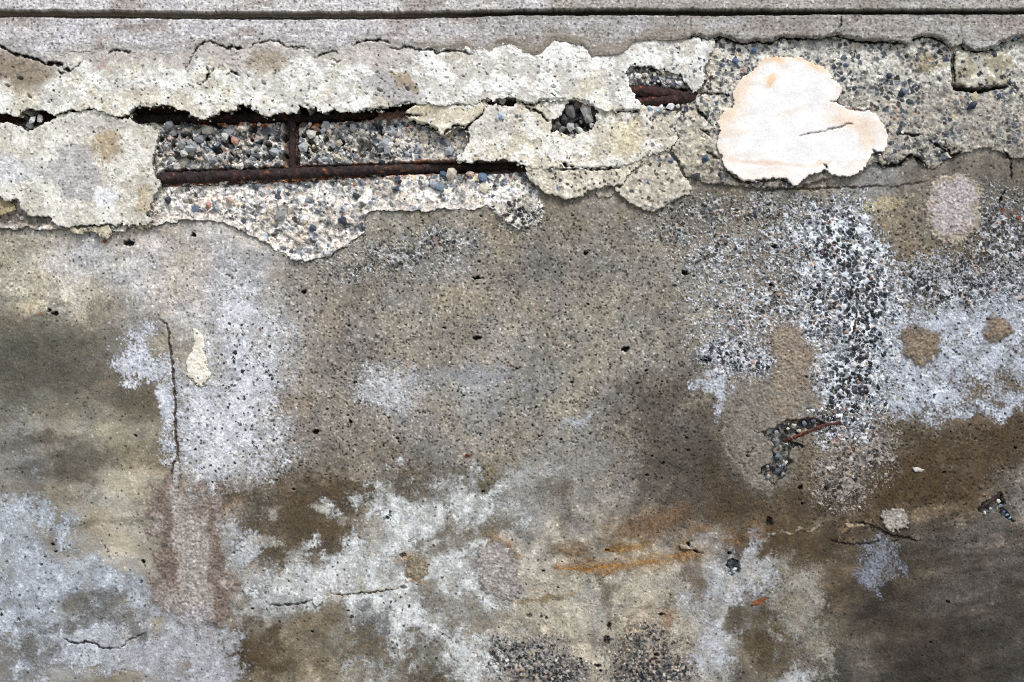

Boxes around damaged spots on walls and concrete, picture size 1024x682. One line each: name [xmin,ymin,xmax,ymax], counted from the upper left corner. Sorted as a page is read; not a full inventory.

crack [0,45,80,74]
rust [629,85,698,107]
crack [687,16,1020,82]
rust [133,108,526,185]
peeling [0,35,1024,263]
crack [161,320,179,480]
leakage [831,279,1024,491]
leakage [0,254,837,682]
rust [555,542,654,576]
leakage [853,534,907,597]